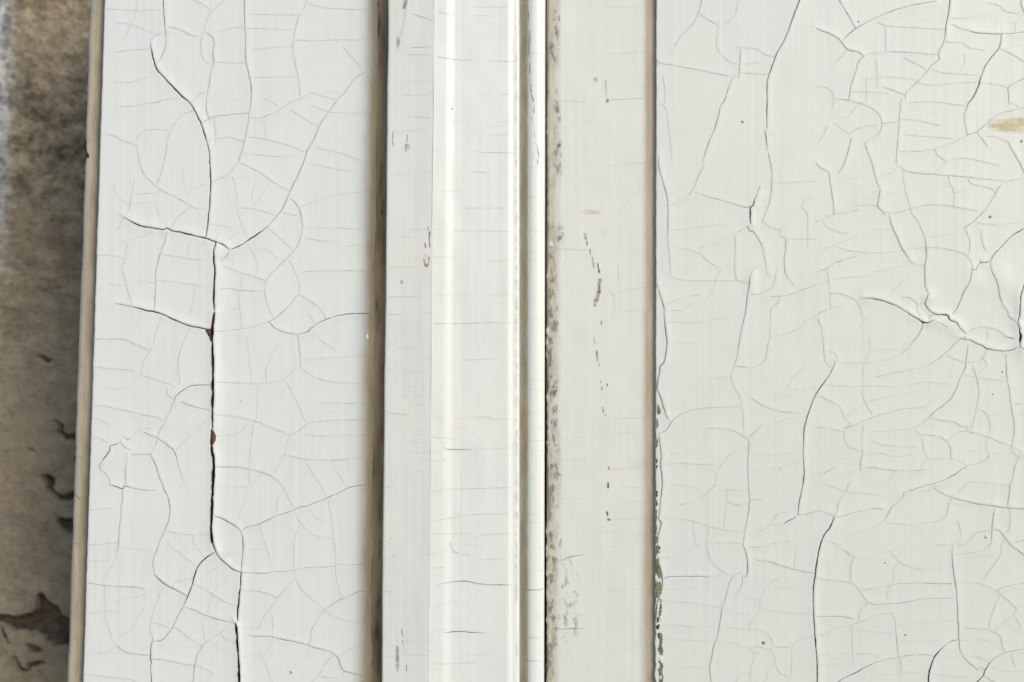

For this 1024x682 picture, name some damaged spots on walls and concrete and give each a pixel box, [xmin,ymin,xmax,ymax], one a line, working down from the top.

crack [69,0,585,682]
peeling [655,490,664,682]
crack [527,0,1024,682]